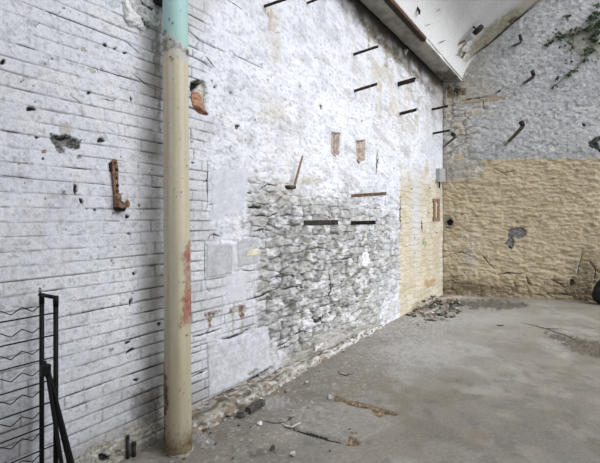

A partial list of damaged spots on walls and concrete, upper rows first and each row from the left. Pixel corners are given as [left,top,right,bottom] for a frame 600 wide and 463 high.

peeling [106,0,189,113]
spalling [190,81,208,115]
spalling [50,124,82,157]
spalling [588,136,600,152]
spalling [503,227,526,249]
rust [229,305,246,332]
water stain [262,396,295,412]